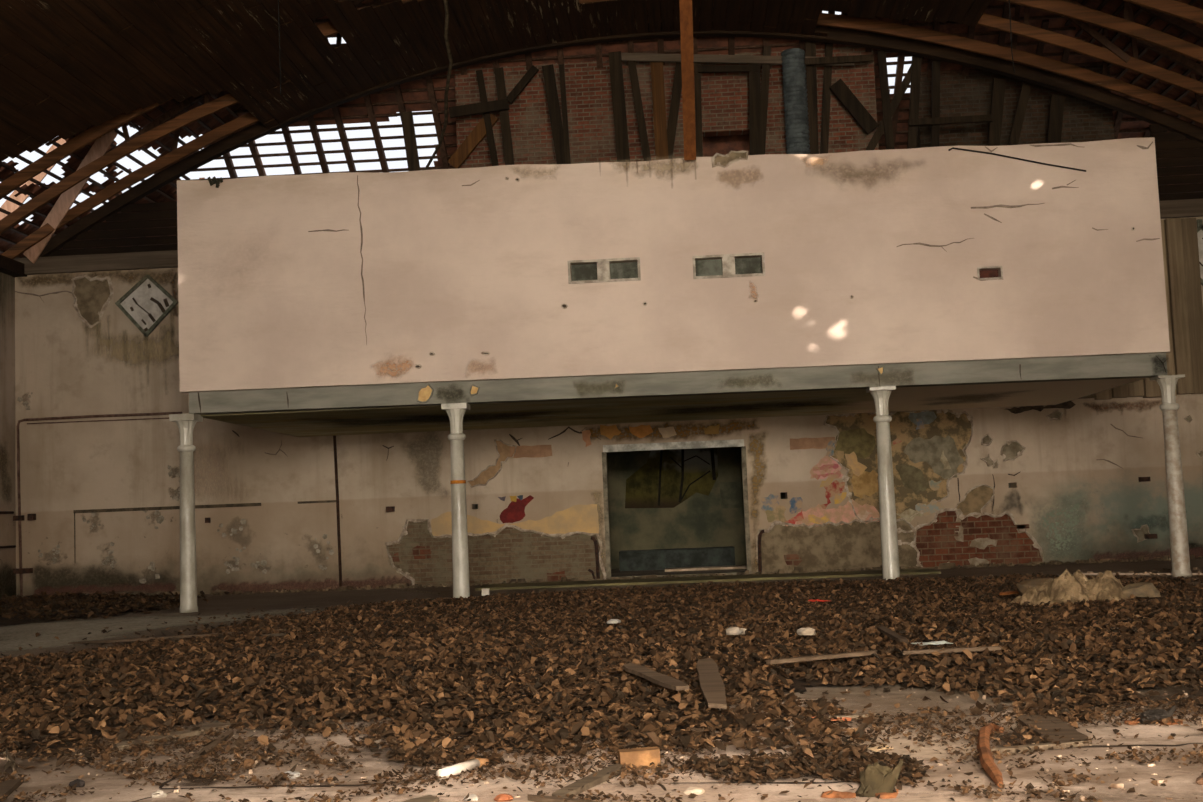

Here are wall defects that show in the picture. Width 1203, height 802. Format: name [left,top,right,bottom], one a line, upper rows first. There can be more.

flaking render [711,150,748,168]
crack [896,180,1079,252]
crack [308,175,367,345]
flaking render [71,274,114,328]
flaking render [756,409,1044,574]
flaking render [212,512,453,593]
flaking render [467,504,607,584]